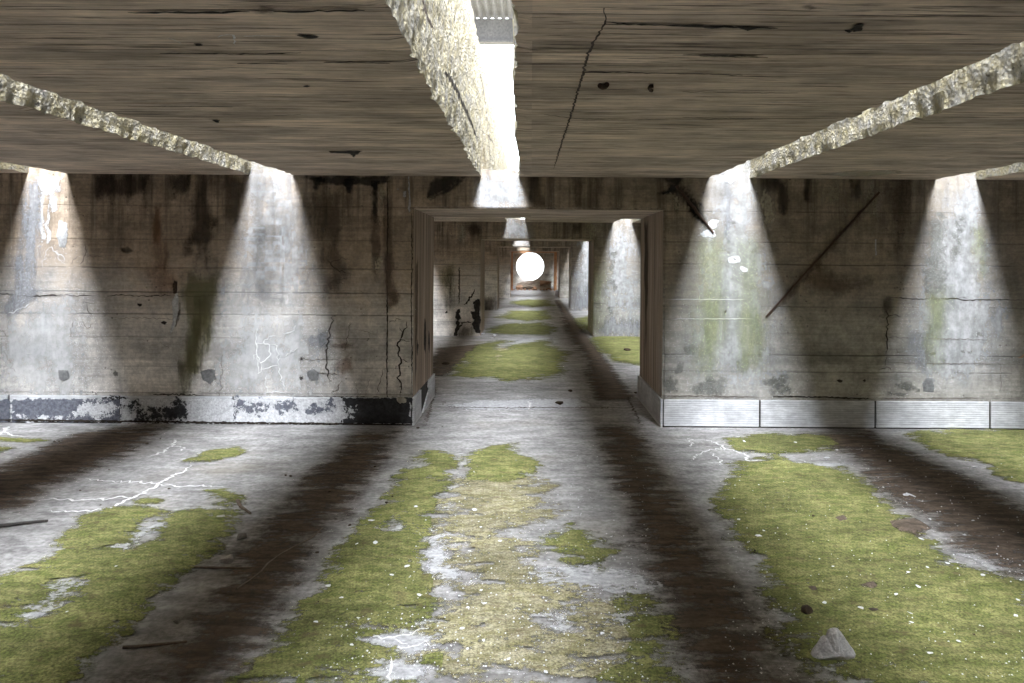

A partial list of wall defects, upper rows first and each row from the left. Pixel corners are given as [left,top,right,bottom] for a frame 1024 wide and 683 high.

crack [544,8,778,167]
crack [683,114,809,122]
water stain [95,174,147,203]
water stain [170,174,215,263]
peeling [0,395,413,425]
crack [0,213,643,512]
spalling [445,299,481,333]
water stain [664,177,790,396]
corrosion [765,191,880,317]
crack [879,297,1024,398]